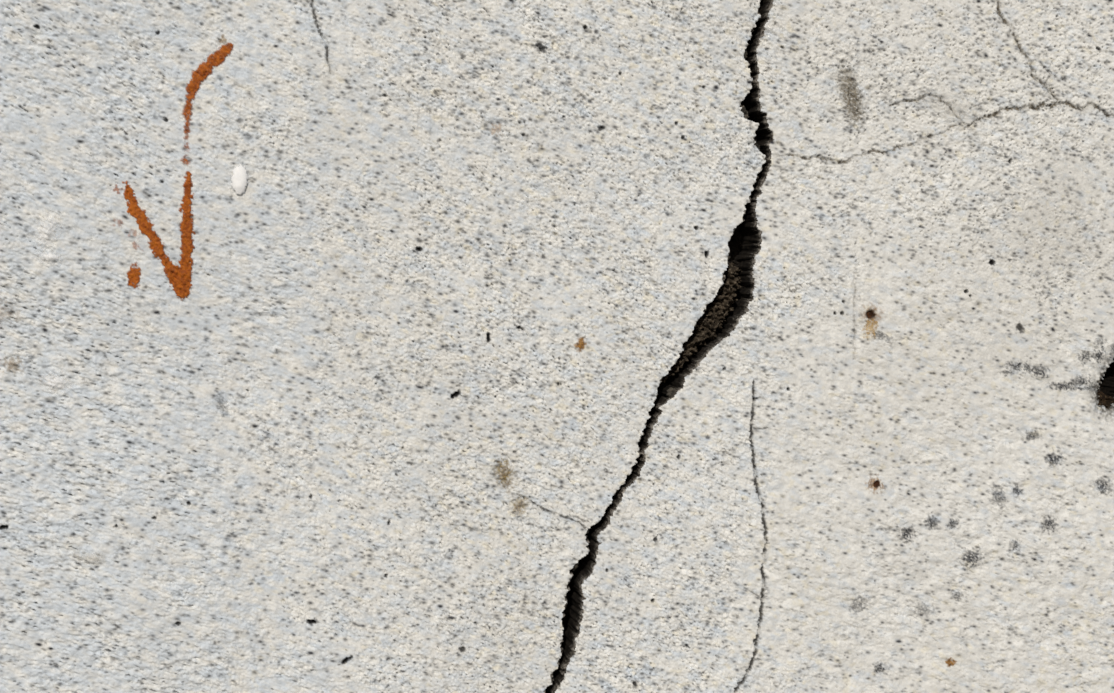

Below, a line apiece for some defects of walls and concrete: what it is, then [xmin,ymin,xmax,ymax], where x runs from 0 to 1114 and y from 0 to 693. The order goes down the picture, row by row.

crack [311,0,328,61]
crack [531,0,1109,693]
corrosion [866,310,877,335]
spalling [1092,358,1114,414]